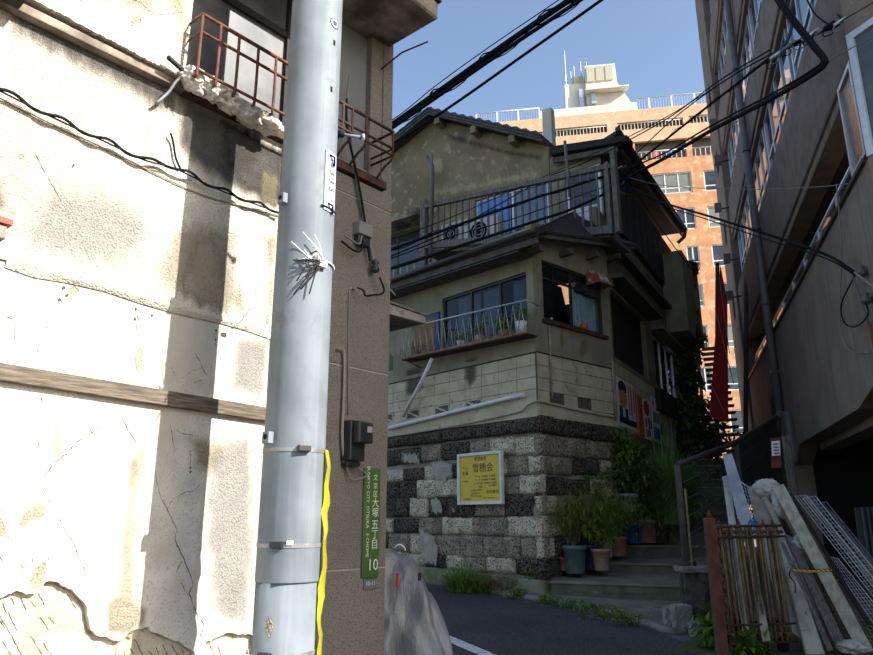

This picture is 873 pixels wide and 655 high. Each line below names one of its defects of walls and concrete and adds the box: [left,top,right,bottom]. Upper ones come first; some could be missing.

leakage [12,14,282,206]
peeling [0,500,51,537]
crack [30,396,136,588]
spalling [0,554,190,655]
leakage [111,547,144,629]
crack [155,426,206,642]
leakage [196,440,249,621]
spalling [206,634,251,655]